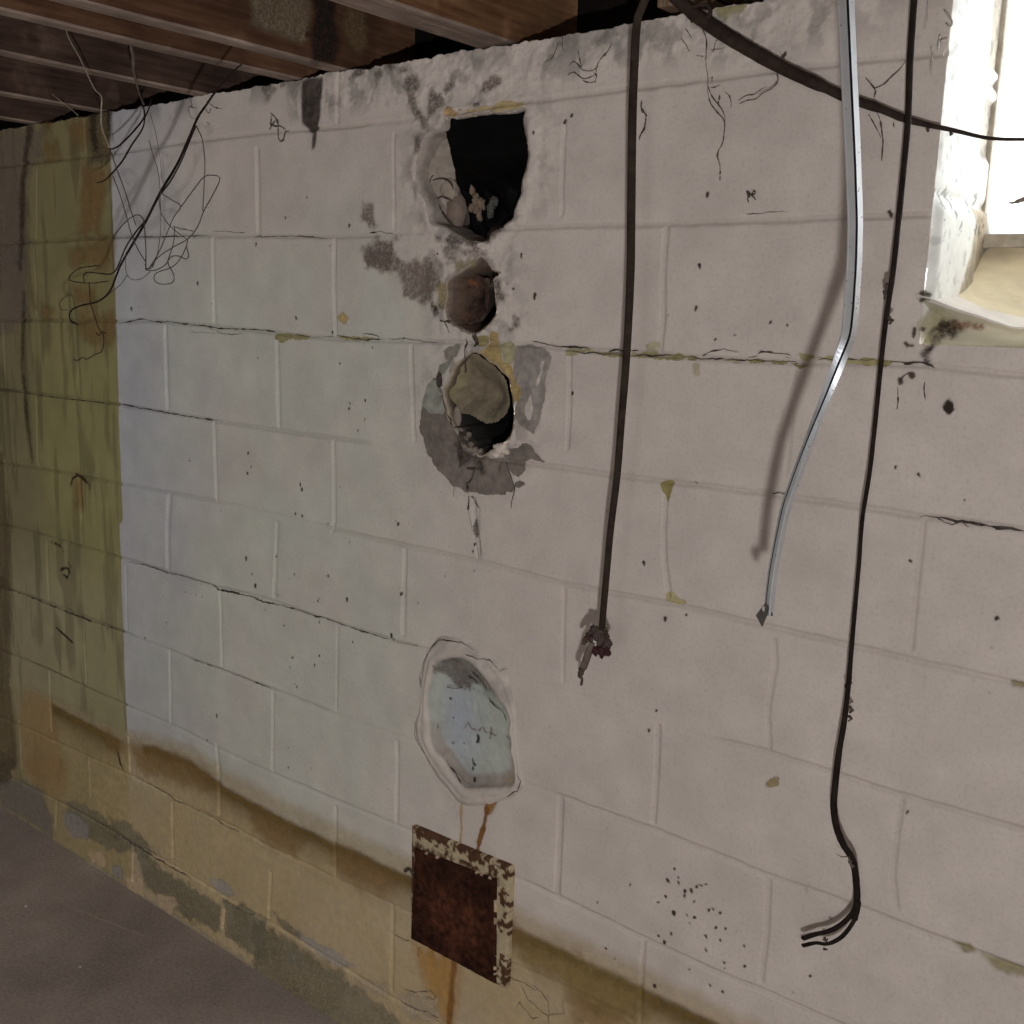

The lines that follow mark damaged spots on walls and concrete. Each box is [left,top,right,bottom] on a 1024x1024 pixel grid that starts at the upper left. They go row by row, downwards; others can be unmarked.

damp [90,111,111,163]
damp [0,127,43,359]
spalling [415,101,552,495]
crack [533,341,934,368]
crack [921,516,1024,532]
crack [0,587,121,631]
crack [133,562,418,646]
damp [0,455,715,1024]
rust [477,802,496,851]
damp [990,958,1024,974]